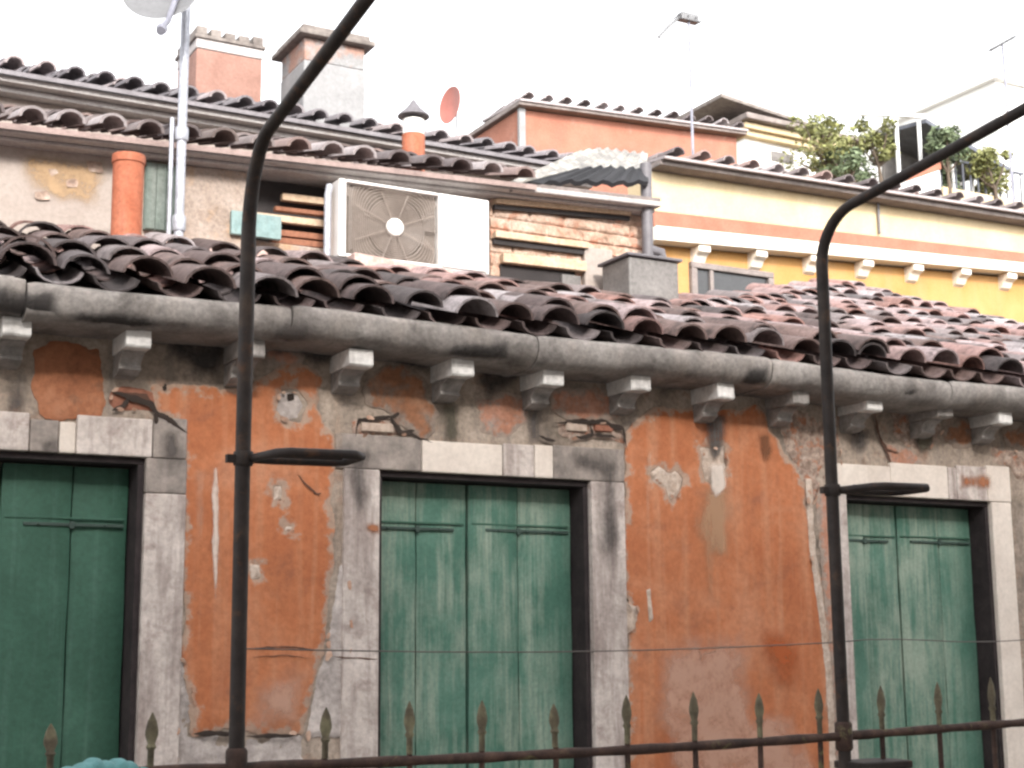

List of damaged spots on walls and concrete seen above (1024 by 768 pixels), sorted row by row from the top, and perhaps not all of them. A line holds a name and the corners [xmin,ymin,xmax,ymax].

crack [110,384,189,434]
spalling [277,391,303,422]
spalling [351,415,407,437]
spalling [558,422,625,444]
flaking render [700,446,729,484]
flaking render [650,466,682,499]
spalling [780,410,843,768]